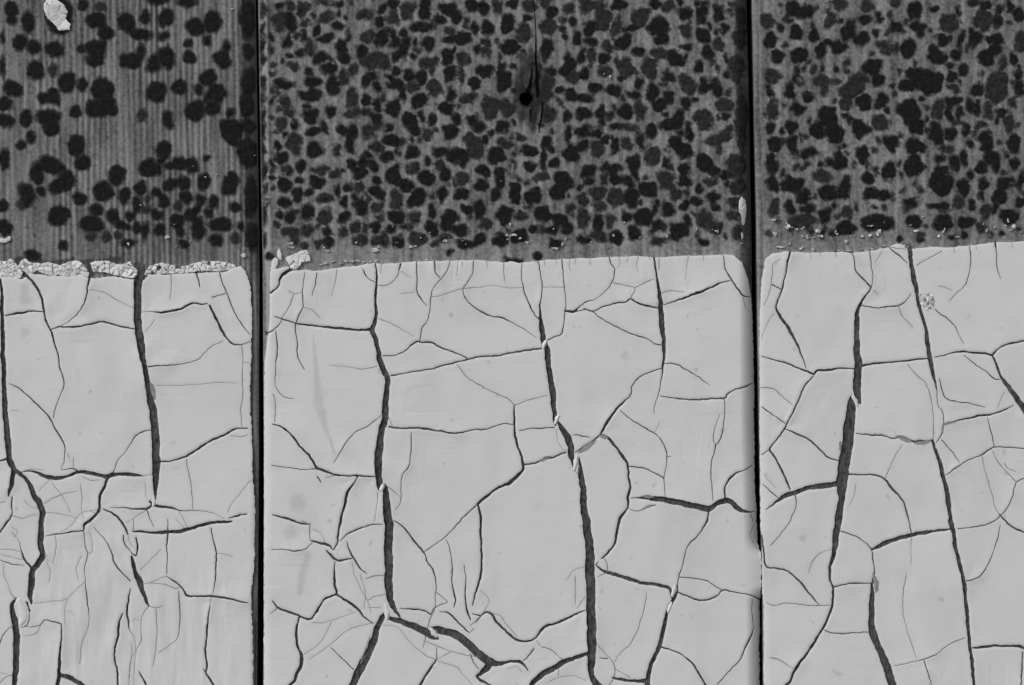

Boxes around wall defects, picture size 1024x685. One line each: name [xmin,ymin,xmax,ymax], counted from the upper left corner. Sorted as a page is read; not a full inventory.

peeling [44,0,71,31]
leakage [0,0,748,263]
leakage [760,0,1024,243]
peeling [772,219,885,252]
peeling [0,253,247,279]
peeling [271,242,386,270]
crack [0,242,1024,685]